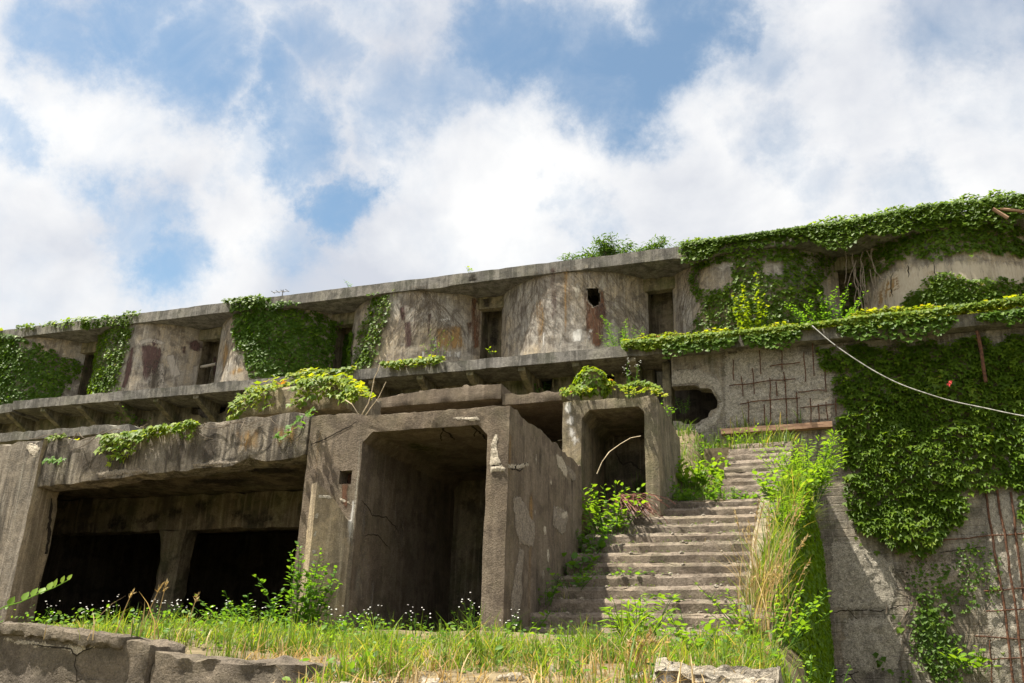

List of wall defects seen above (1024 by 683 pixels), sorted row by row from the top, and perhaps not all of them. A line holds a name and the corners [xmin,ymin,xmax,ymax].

spalling [672,343,837,433]
spalling [490,434,505,472]
spalling [511,496,568,625]
crack [30,643,93,682]